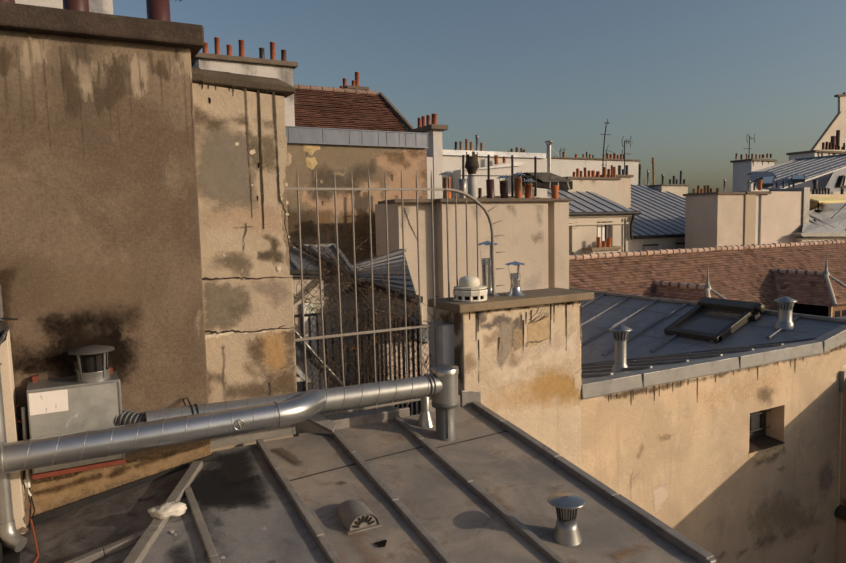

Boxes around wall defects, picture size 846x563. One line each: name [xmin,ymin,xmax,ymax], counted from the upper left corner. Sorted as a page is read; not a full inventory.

water stain [0,36,49,78]
water stain [62,48,283,262]
flaking render [303,144,320,170]
flaking render [299,149,427,217]
water stain [221,254,251,273]
crack [202,274,290,282]
water stain [227,329,297,397]